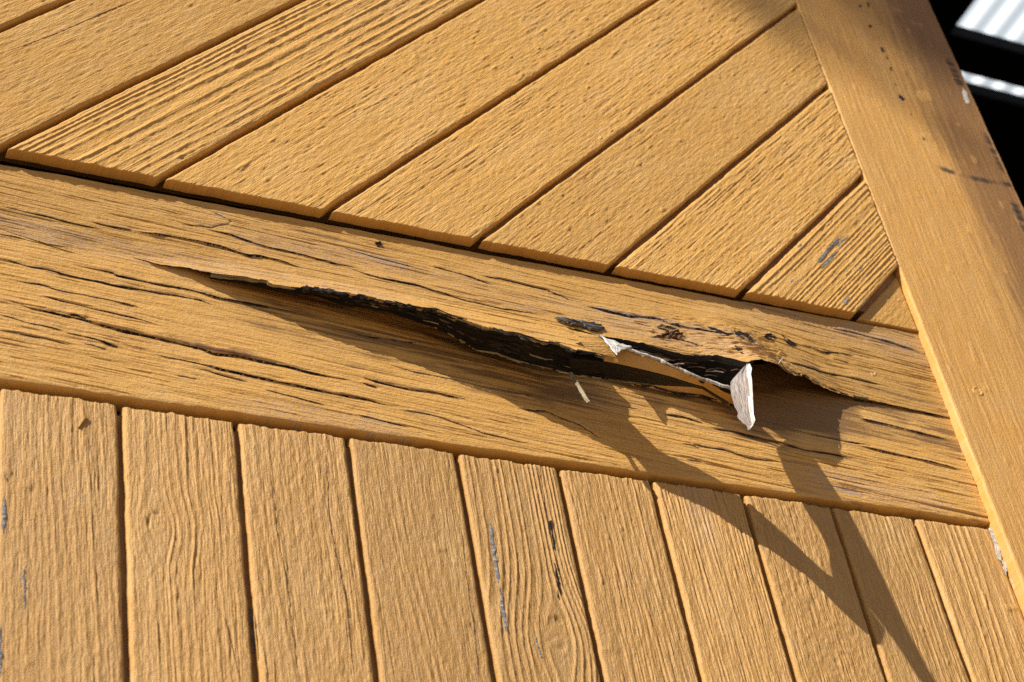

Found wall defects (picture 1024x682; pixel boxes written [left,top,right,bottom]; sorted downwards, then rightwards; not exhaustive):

crack [0,234,599,443]
spalling [596,335,755,394]
peeling [489,522,508,633]